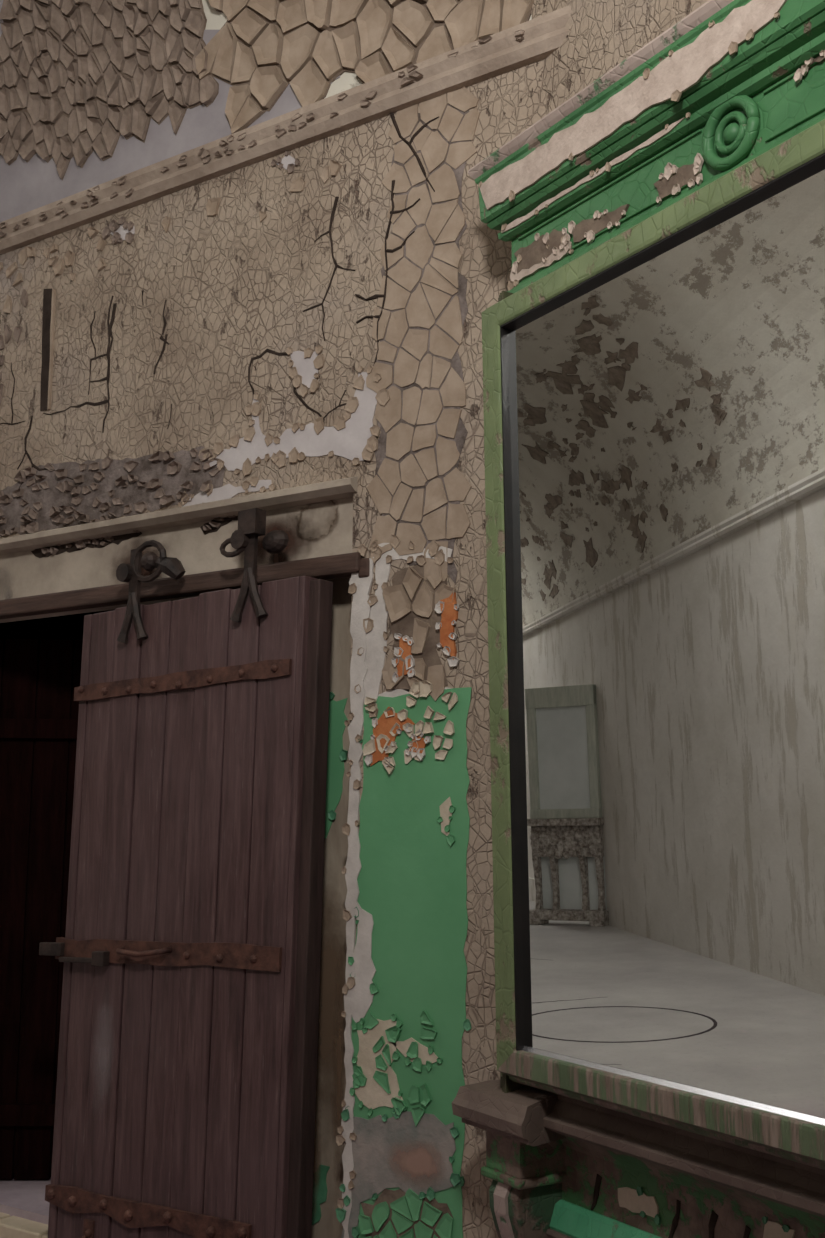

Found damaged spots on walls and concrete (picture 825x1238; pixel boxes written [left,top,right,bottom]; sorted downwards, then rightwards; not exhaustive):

peeling [0,0,534,237]
peeling [0,243,76,404]
crack [0,290,169,488]
peeling [31,530,142,558]
peeling [0,364,390,537]
crack [248,349,288,396]
crack [293,87,480,701]
peeling [328,535,465,1238]